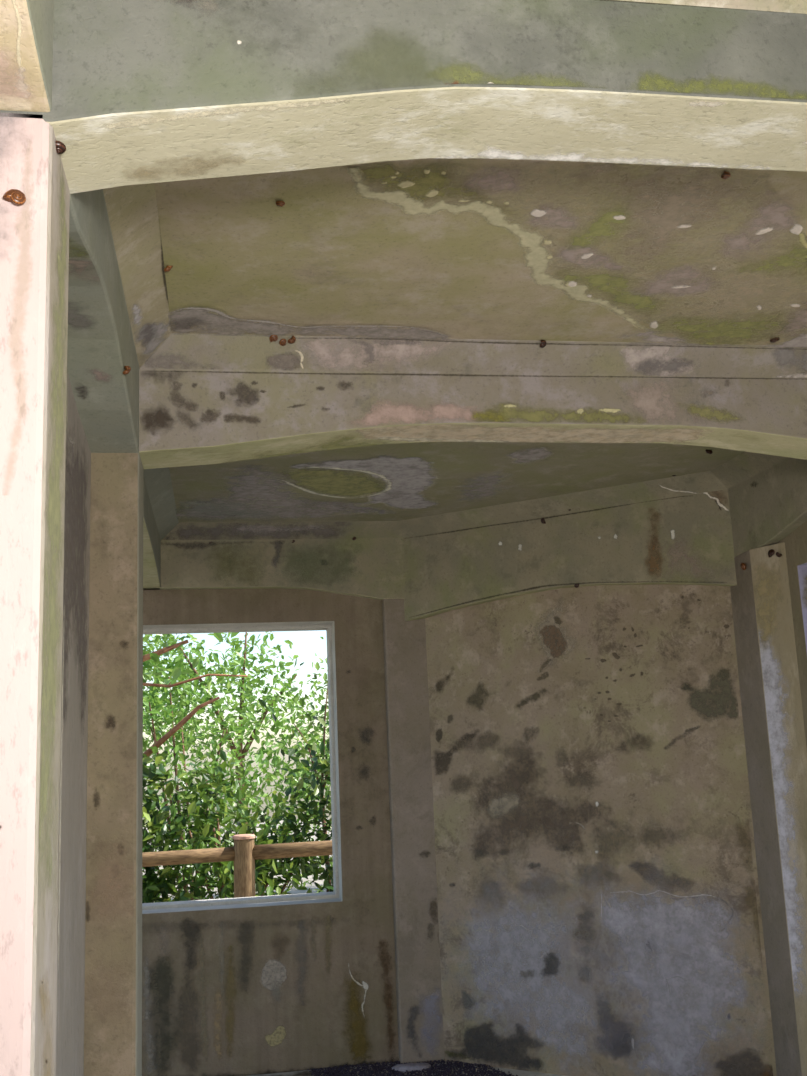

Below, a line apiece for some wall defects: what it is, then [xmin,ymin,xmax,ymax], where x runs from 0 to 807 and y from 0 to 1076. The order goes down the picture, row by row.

leakage [68,305,92,328]
leakage [133,305,448,429]
peeling [349,165,807,345]
peeling [278,456,435,509]
leakage [62,425,87,718]
leakage [665,669,739,749]
leakage [460,728,598,857]
leakage [143,920,252,1073]
leakage [446,863,773,1076]